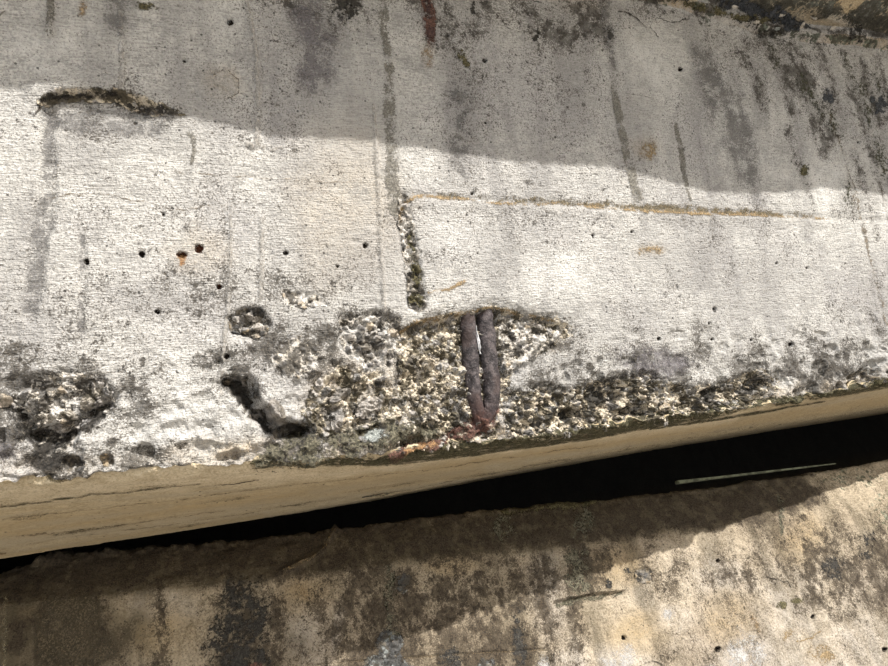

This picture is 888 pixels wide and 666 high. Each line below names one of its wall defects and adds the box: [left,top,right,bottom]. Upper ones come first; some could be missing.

rust [420,0,437,67]
spalling [37,86,186,117]
leakage [378,0,401,218]
leakage [693,47,758,200]
leakage [674,123,692,201]
spalling [221,305,780,453]
leakage [617,347,690,379]
spalling [0,371,115,473]
leakage [33,591,120,666]
leakage [511,605,529,666]
leakage [727,635,766,665]